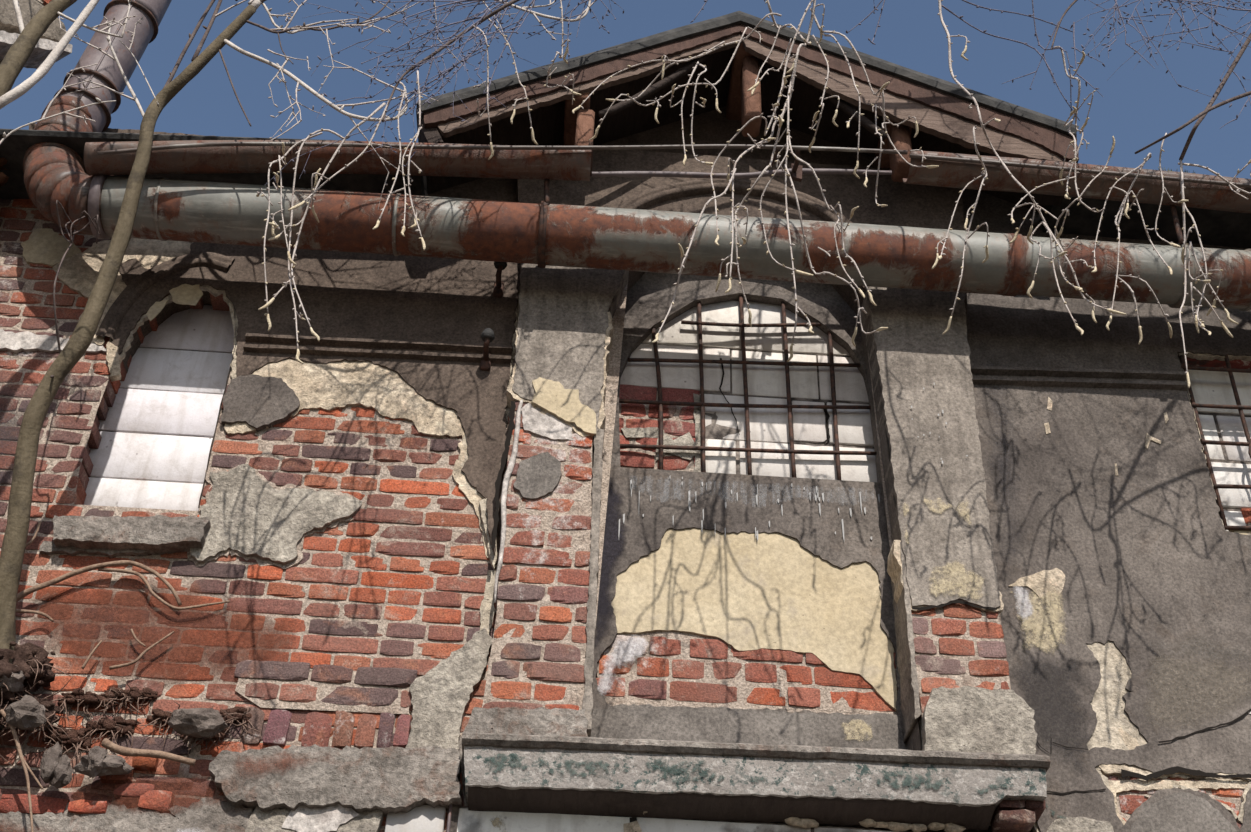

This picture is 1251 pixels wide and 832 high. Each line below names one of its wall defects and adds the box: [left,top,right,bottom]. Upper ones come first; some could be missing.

flaking render [221,358,596,603]
flaking render [591,528,906,749]
crack [1158,709,1251,743]
flaking render [0,757,173,814]
flaking render [282,804,361,832]